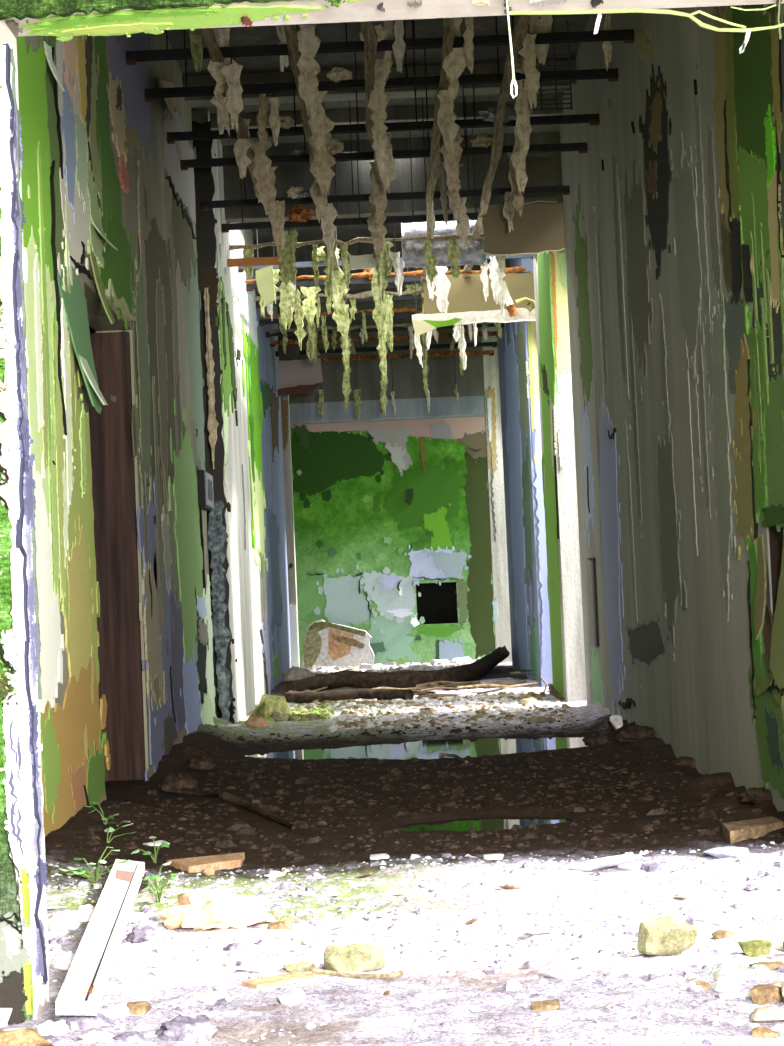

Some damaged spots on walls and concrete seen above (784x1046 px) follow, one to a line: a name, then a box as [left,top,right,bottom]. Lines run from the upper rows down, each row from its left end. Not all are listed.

peeling [43,32,196,414]
peeling [137,474,217,781]
peeling [226,302,241,426]
flaking render [243,287,258,357]
peeling [270,385,492,667]
peeling [517,321,529,460]
damp [504,4,784,799]